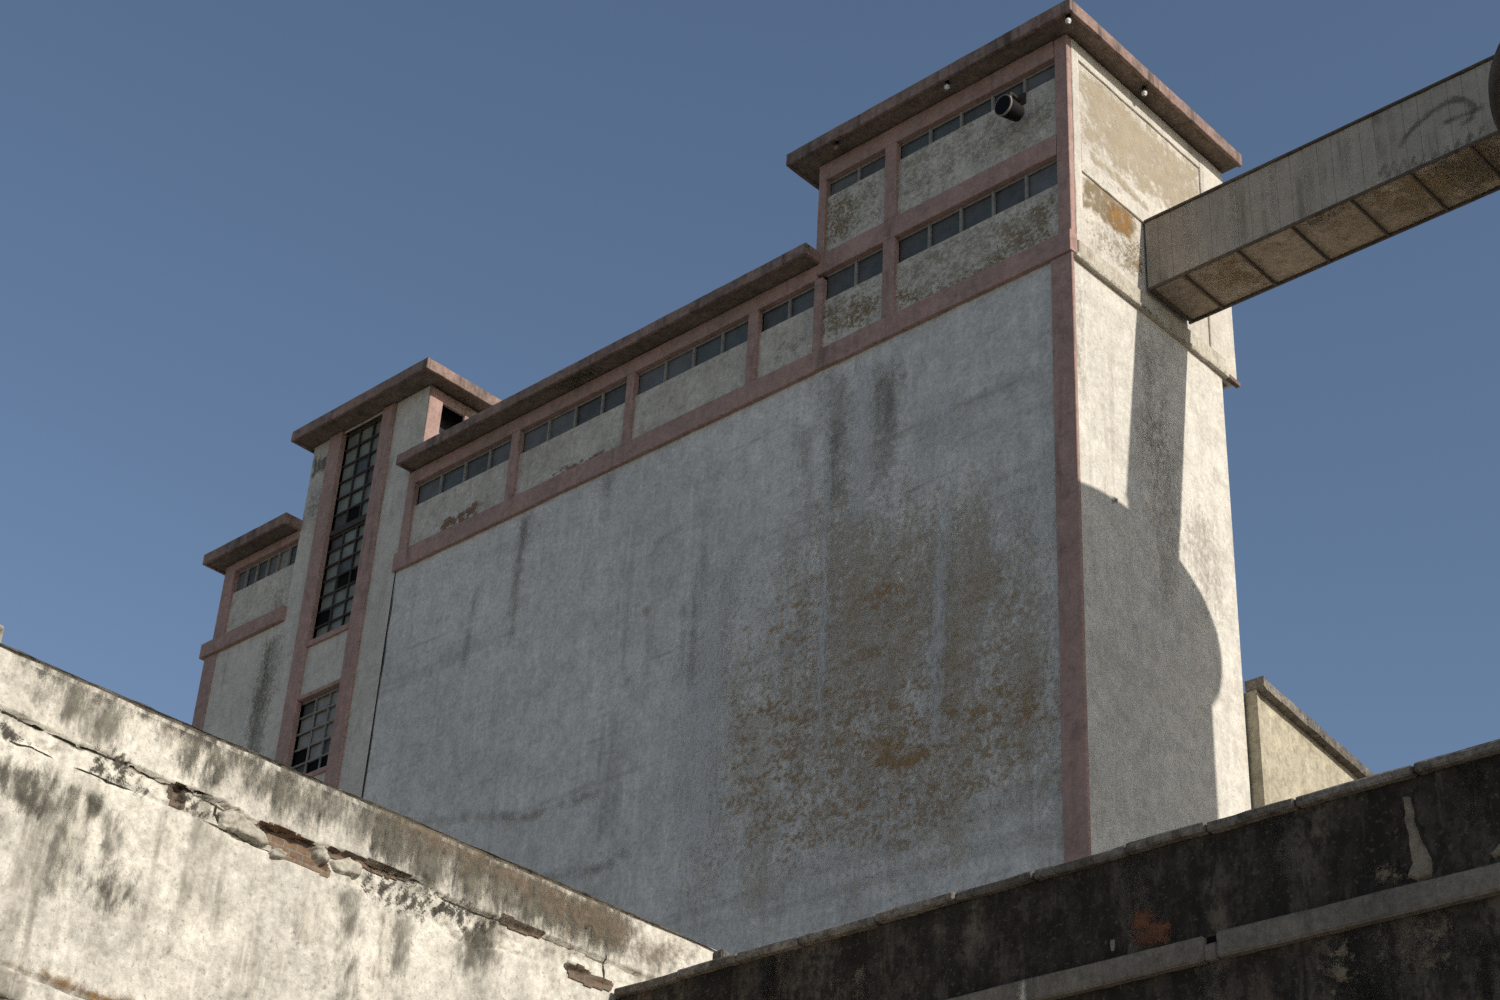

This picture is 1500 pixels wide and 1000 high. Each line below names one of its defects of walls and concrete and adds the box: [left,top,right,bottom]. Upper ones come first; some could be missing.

rust [1083,180,1135,238]
crack [362,584,395,798]
crack [0,709,328,851]
leakage [0,640,693,975]
crack [408,879,500,921]
peeling [1403,796,1436,882]